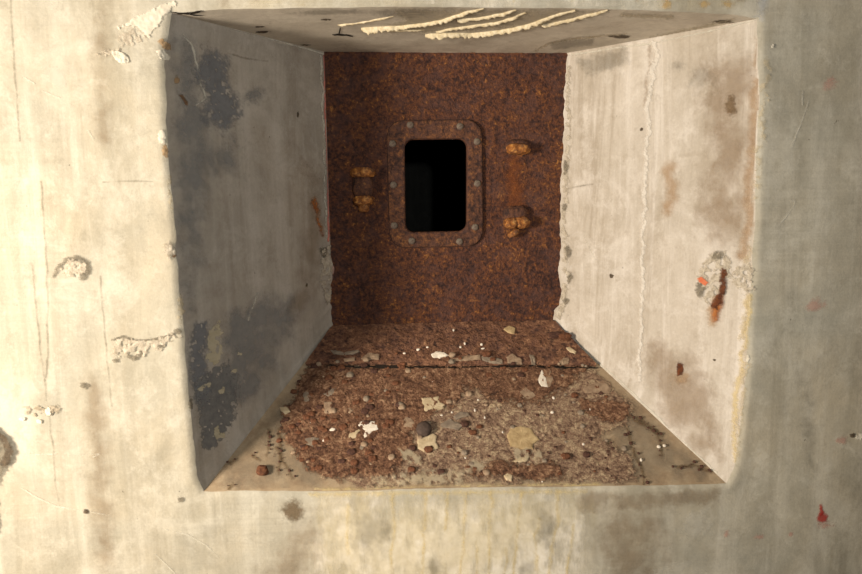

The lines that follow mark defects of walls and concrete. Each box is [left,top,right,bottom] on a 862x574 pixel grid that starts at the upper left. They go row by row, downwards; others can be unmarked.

spalling [158,130,168,158]
water stain [177,51,261,198]
spalling [53,256,90,280]
peeling [112,305,292,450]
crack [326,362,598,370]
spalling [0,433,13,473]